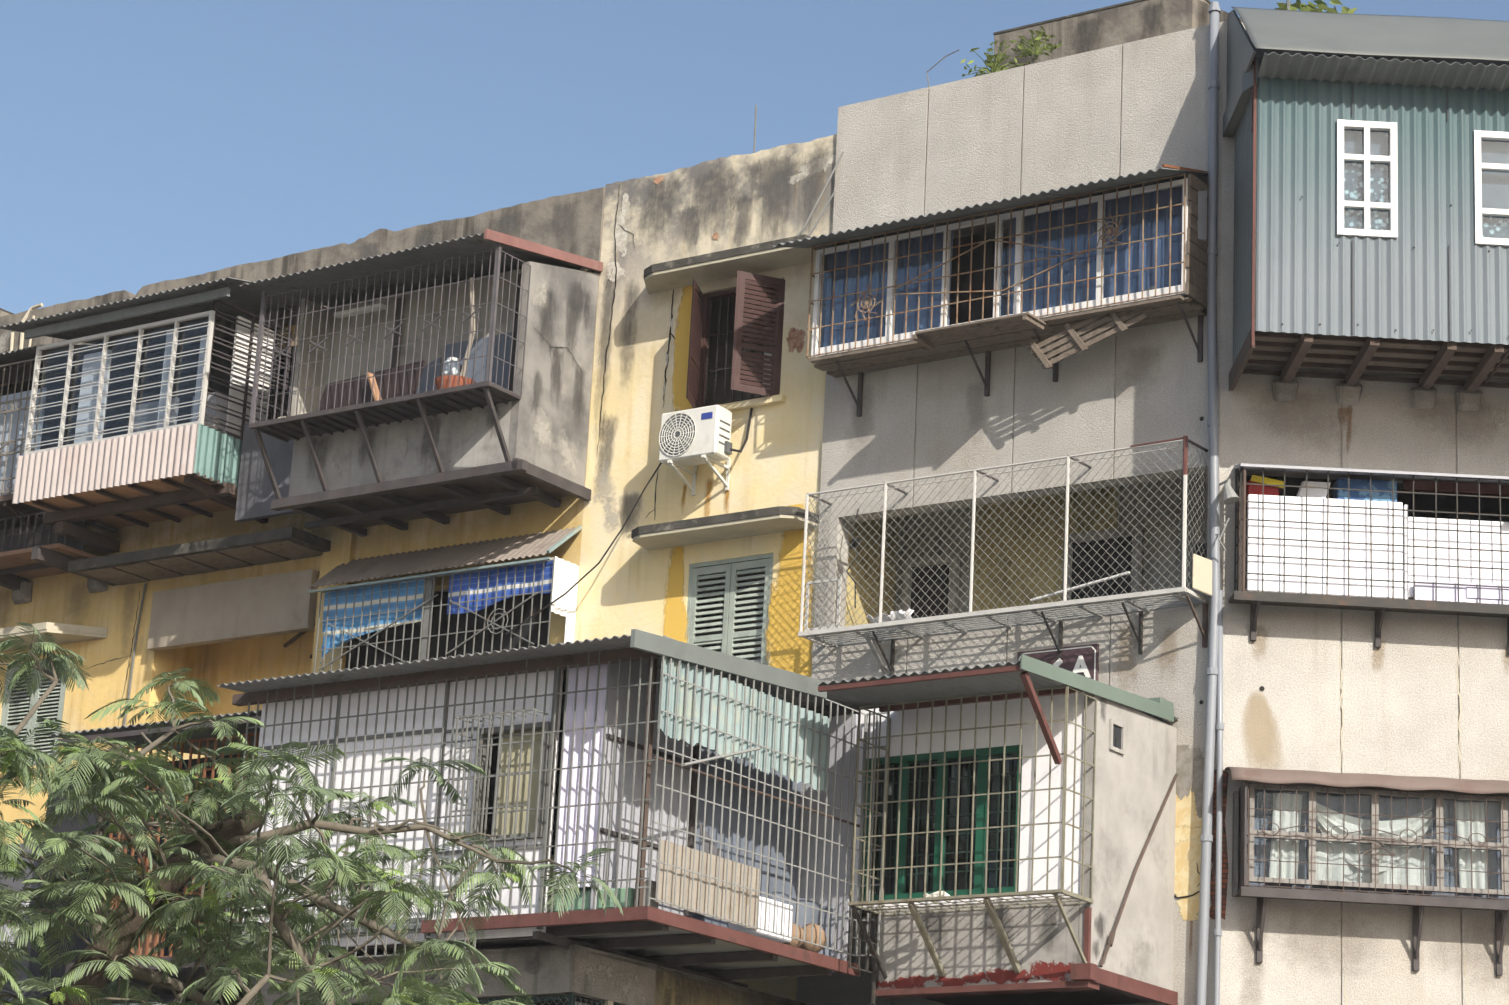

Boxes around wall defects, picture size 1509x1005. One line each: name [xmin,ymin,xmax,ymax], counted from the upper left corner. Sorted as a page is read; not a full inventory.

water stain [645,160,790,242]
water stain [808,156,820,215]
water stain [534,280,635,403]
water stain [600,420,614,472]
water stain [624,495,639,527]
peeling [1174,744,1228,921]
peeling [876,960,1075,989]